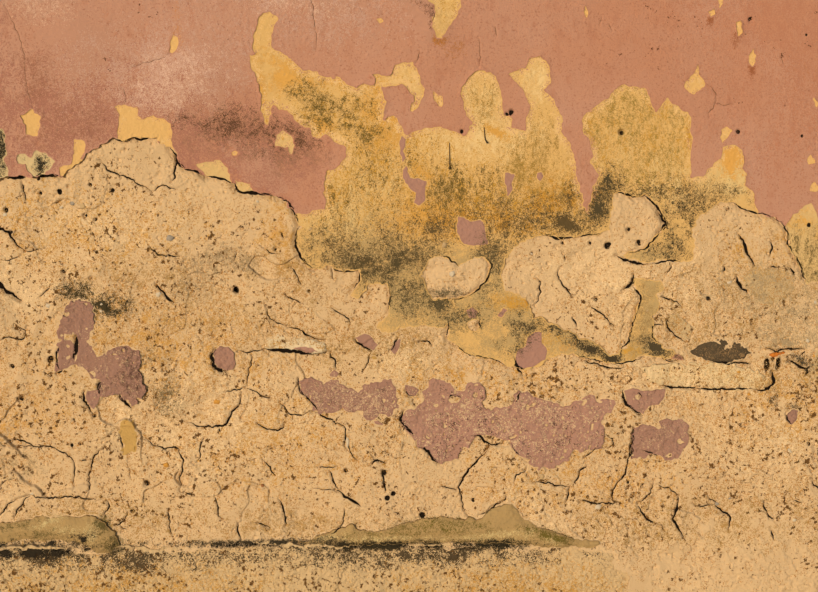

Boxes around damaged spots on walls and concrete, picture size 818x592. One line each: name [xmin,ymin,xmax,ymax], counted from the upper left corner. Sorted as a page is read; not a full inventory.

peeling [684,65,705,94]
peeling [20,109,41,136]
peeling [115,105,174,149]
crack [7,172,59,180]
crack [170,148,313,269]
peeling [250,12,614,321]
crack [543,232,600,240]
crack [616,192,668,253]
peeling [582,84,758,262]
crack [732,202,807,280]
flaking render [0,129,818,592]
crack [576,287,642,364]